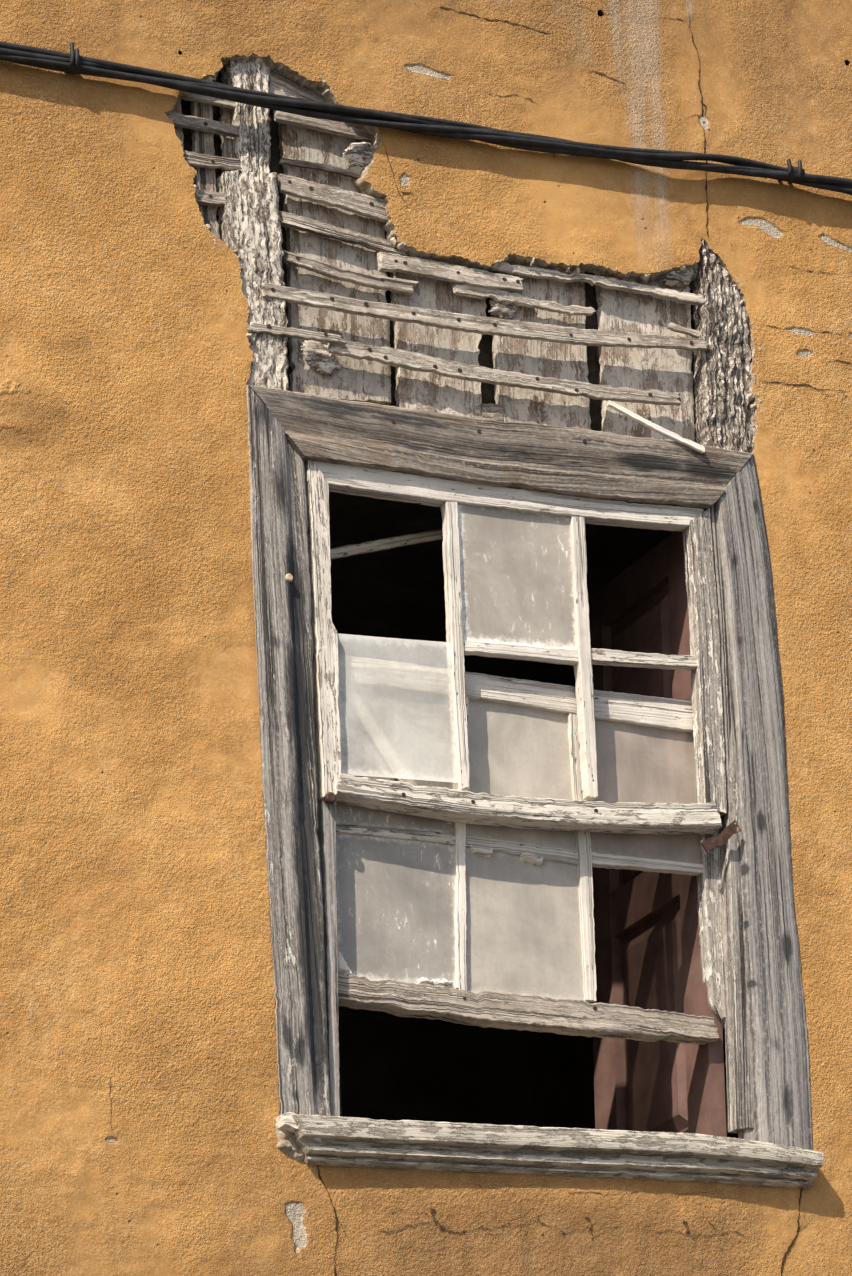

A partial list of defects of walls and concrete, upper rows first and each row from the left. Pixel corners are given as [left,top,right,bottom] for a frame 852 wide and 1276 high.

crack [439,6,554,35]
flaking render [200,53,342,105]
peeling [406,64,452,80]
crack [560,0,709,237]
peeling [739,218,782,238]
peeling [819,233,852,253]
flaking render [343,124,762,452]
flaking render [301,340,343,376]
peeling [285,1202,307,1254]
crack [317,1165,745,1276]
crack [781,1188,810,1276]